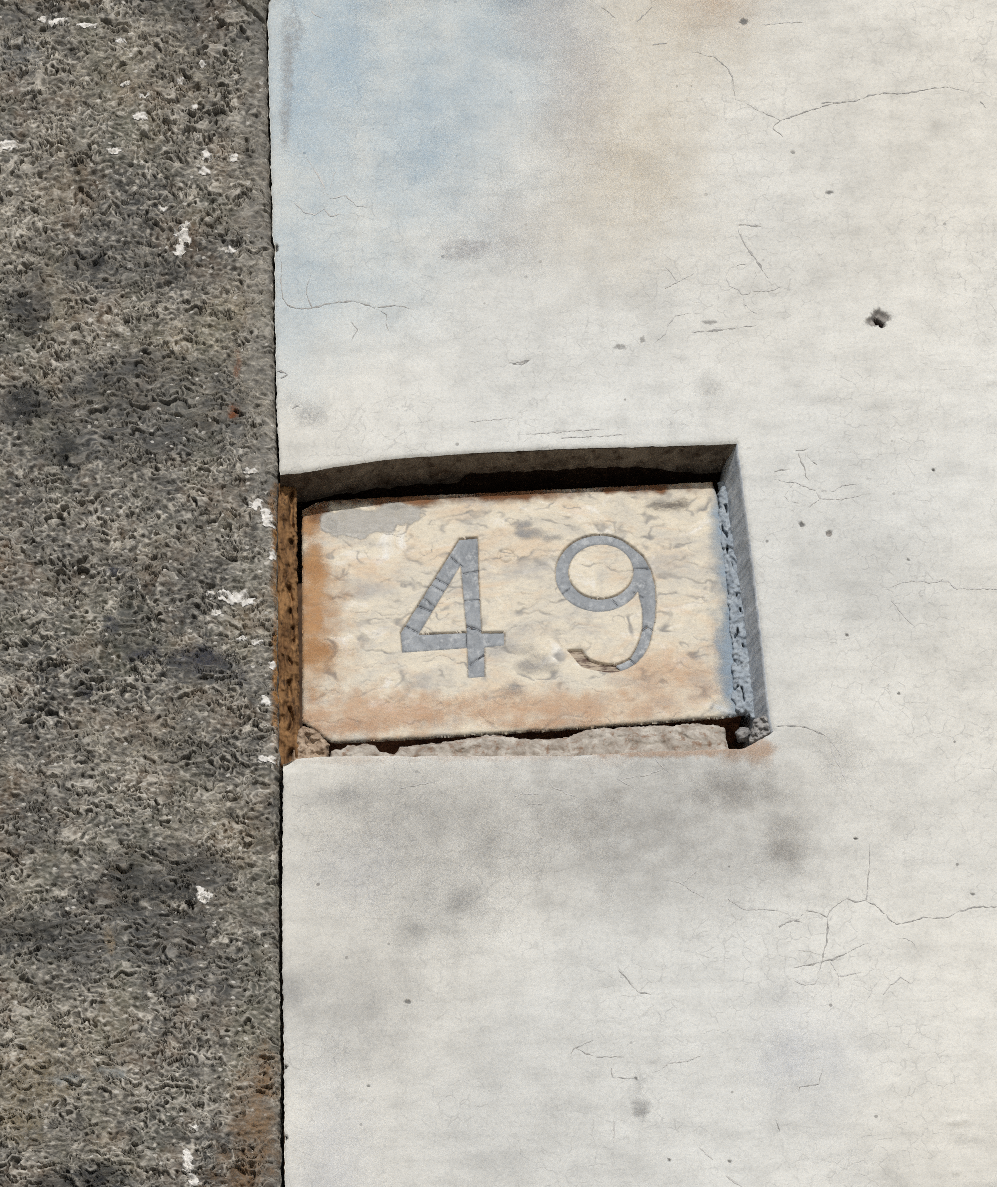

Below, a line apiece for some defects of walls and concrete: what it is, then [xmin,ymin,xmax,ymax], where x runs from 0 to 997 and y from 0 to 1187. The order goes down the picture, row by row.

crack [698,52,986,134]
crack [673,850,997,1001]